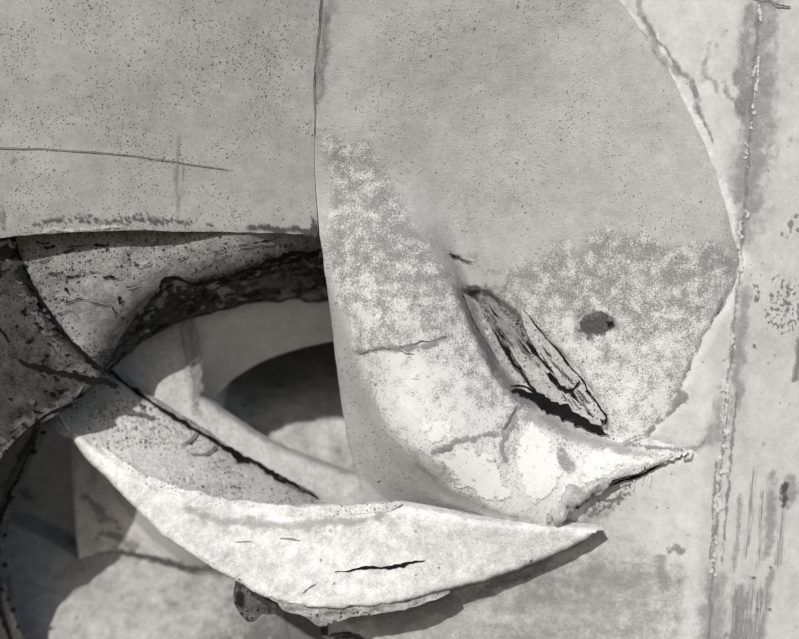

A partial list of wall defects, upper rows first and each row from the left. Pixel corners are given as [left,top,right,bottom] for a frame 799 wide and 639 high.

water stain [637,0,713,140]
spalling [32,212,214,233]
spalling [248,217,318,237]
spalling [105,249,329,372]
spalling [447,253,615,436]
peeling [623,254,740,460]
water stain [700,0,796,639]
spalling [99,445,401,529]
crack [336,560,425,572]
water stain [657,544,685,587]
spalling [233,581,450,639]